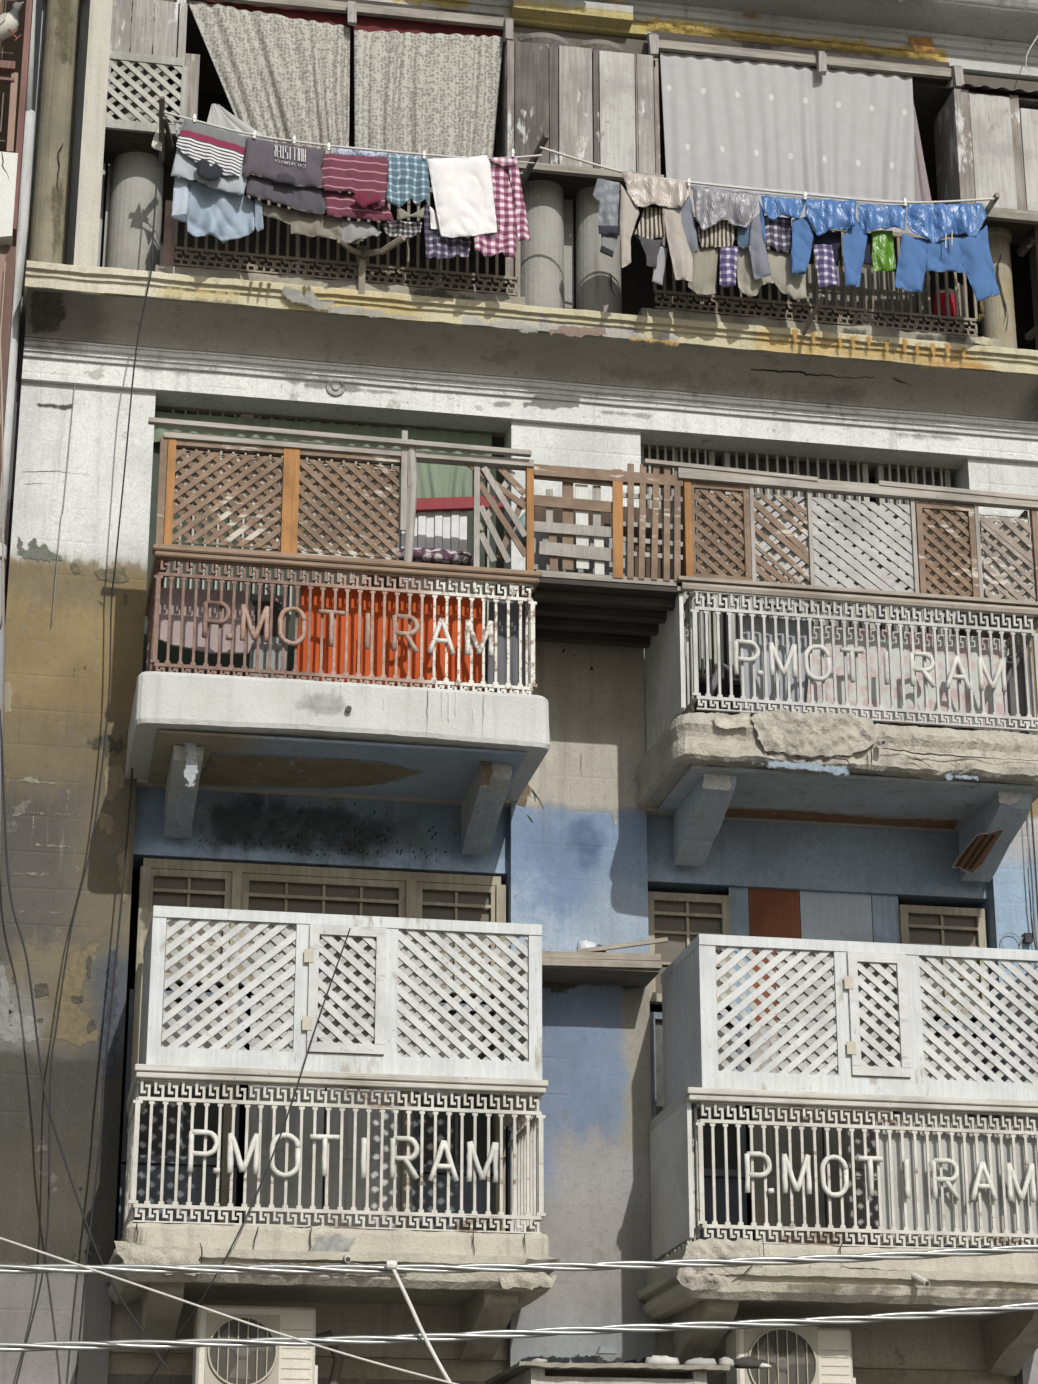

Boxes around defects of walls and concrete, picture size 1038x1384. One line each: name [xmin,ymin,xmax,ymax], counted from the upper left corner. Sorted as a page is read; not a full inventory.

crack [751,369,912,387]
peeling [17,537,129,605]
water stain [199,798,447,862]
peeling [0,940,100,1047]
spalling [114,1241,201,1276]
spalling [226,1262,407,1277]
spalling [499,1272,555,1290]